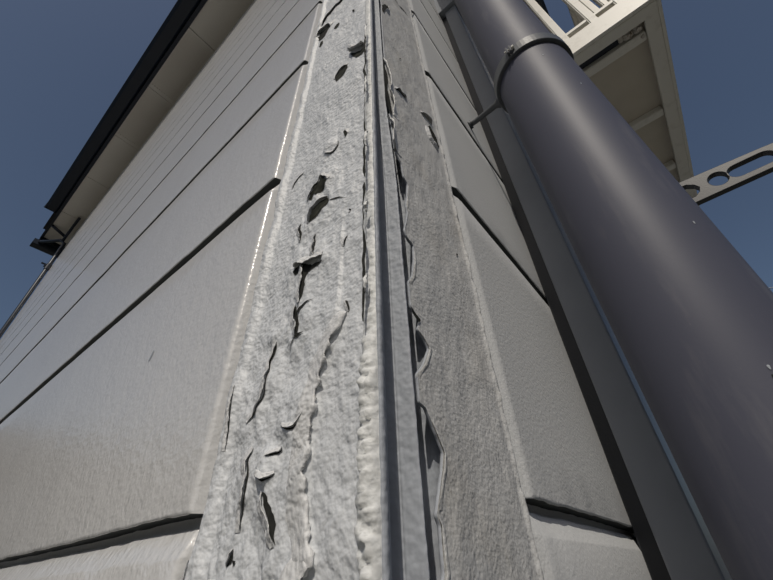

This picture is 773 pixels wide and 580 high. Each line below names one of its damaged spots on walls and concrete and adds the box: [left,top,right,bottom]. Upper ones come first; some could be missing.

peeling [314,19,339,47]
peeling [333,41,364,81]
peeling [382,57,399,154]
peeling [420,111,439,151]
peeling [306,172,345,224]
peeling [412,308,432,379]
peeling [279,311,347,580]